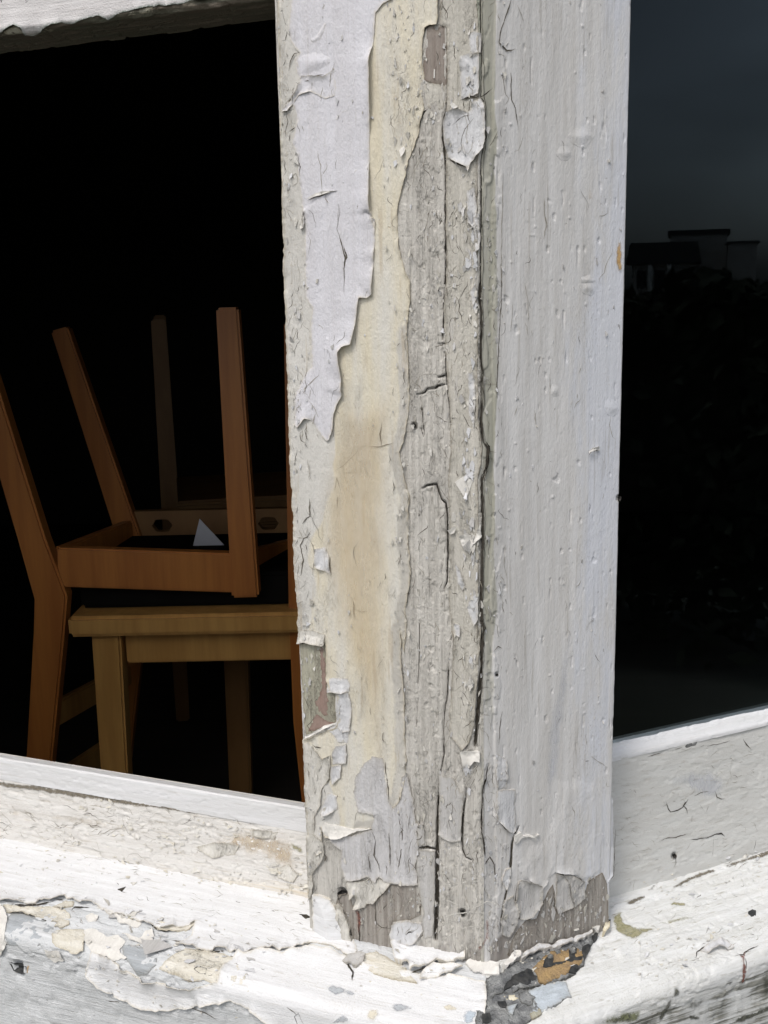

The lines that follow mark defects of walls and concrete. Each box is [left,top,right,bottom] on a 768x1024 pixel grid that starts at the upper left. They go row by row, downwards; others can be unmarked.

crack [0,0,581,977]
crack [585,736,768,976]